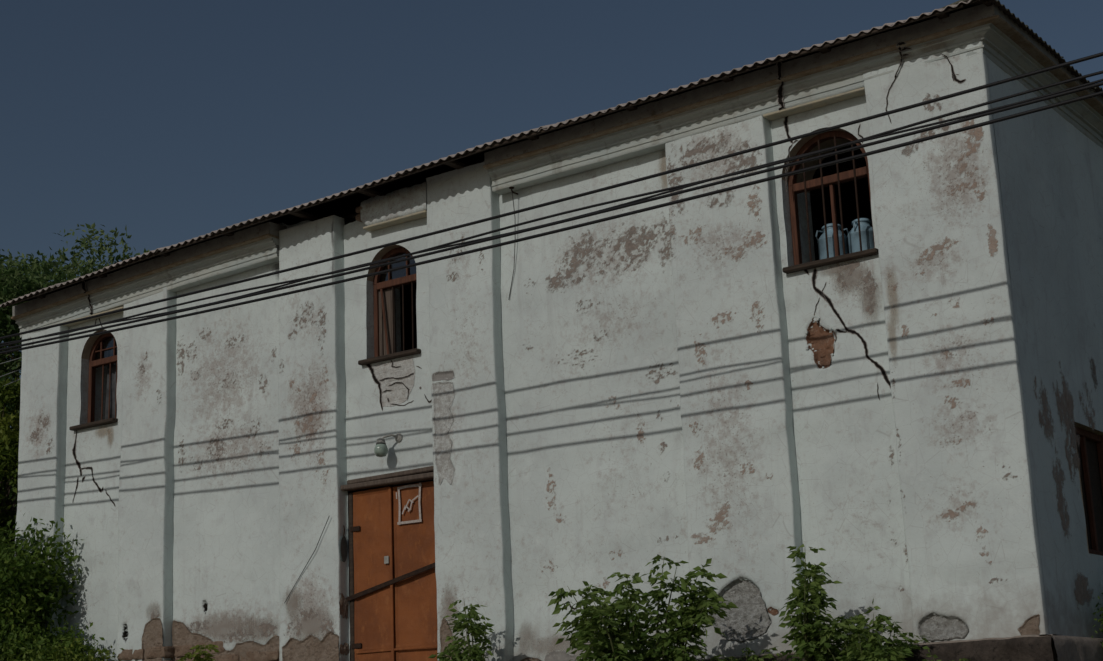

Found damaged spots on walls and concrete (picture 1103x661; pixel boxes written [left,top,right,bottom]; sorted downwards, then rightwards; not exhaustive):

crack [886,41,911,124]
crack [941,54,966,84]
crack [776,62,799,192]
peeling [526,133,766,294]
spalling [804,314,836,368]
crack [803,268,891,400]
crack [366,360,432,411]
spalling [432,371,455,485]
crack [72,431,115,506]
flaking render [118,593,350,661]
spalling [710,577,778,642]
spalling [918,612,968,641]